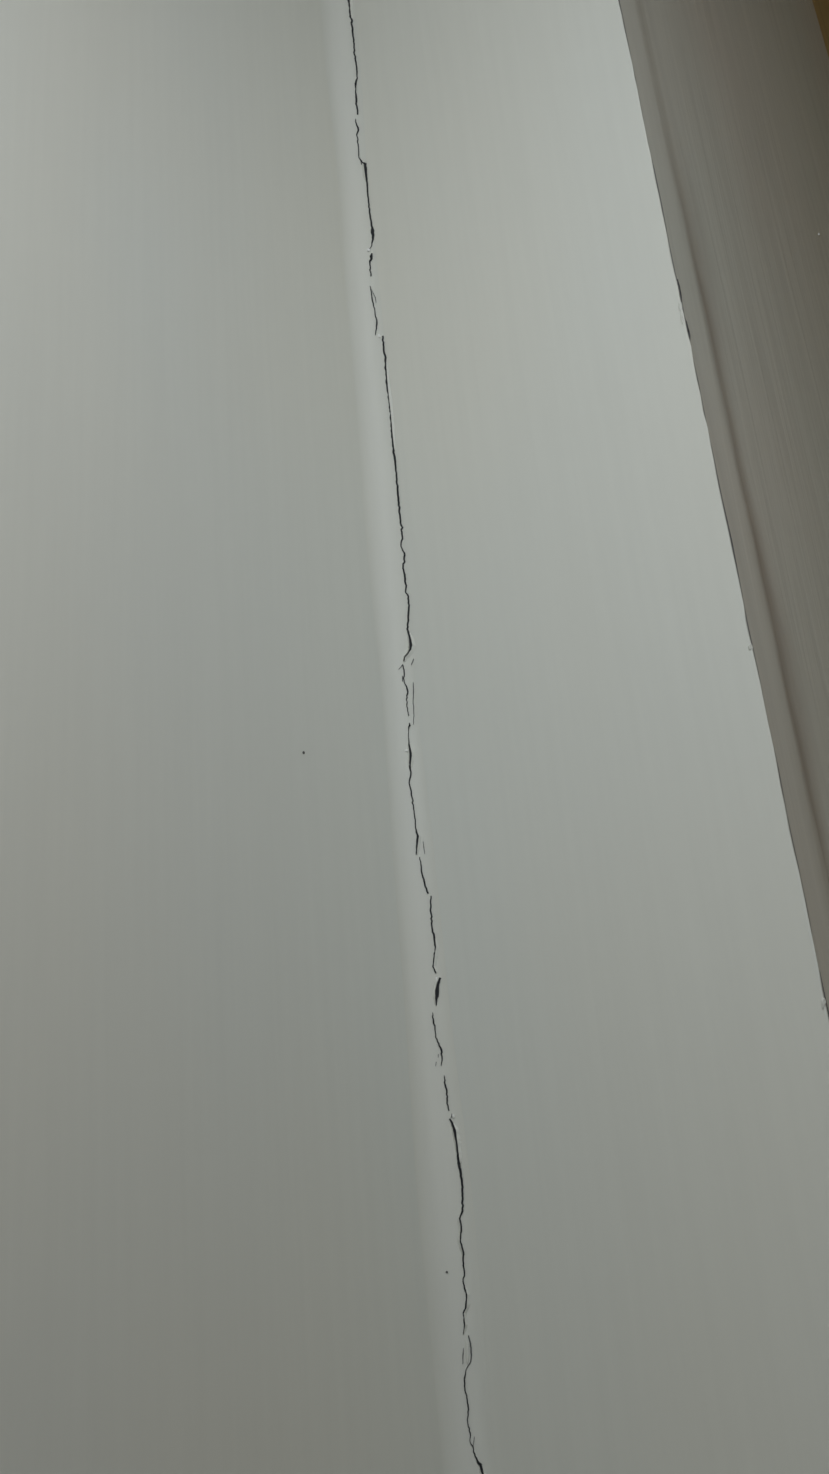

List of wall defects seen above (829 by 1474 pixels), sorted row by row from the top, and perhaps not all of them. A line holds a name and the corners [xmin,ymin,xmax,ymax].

crack [347,0,486,1474]